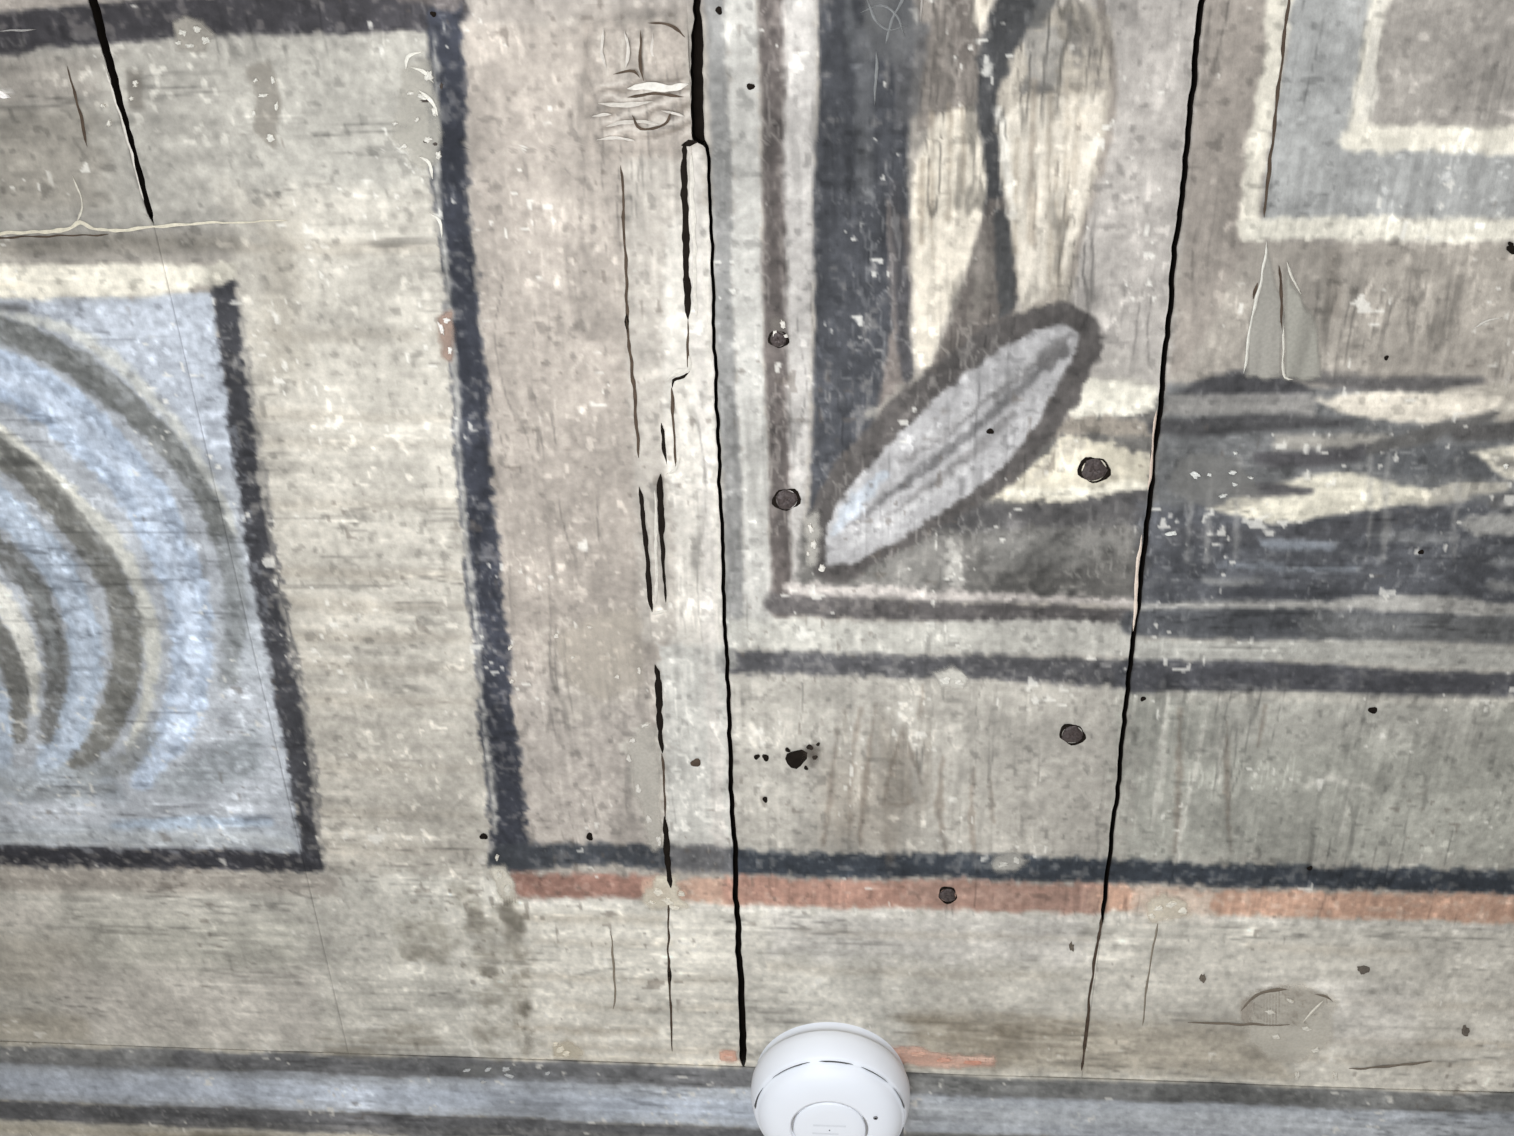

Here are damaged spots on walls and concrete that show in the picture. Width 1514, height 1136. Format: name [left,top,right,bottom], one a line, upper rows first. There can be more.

crack [0,0,287,239]
crack [620,0,747,1060]
crack [1081,0,1205,1071]